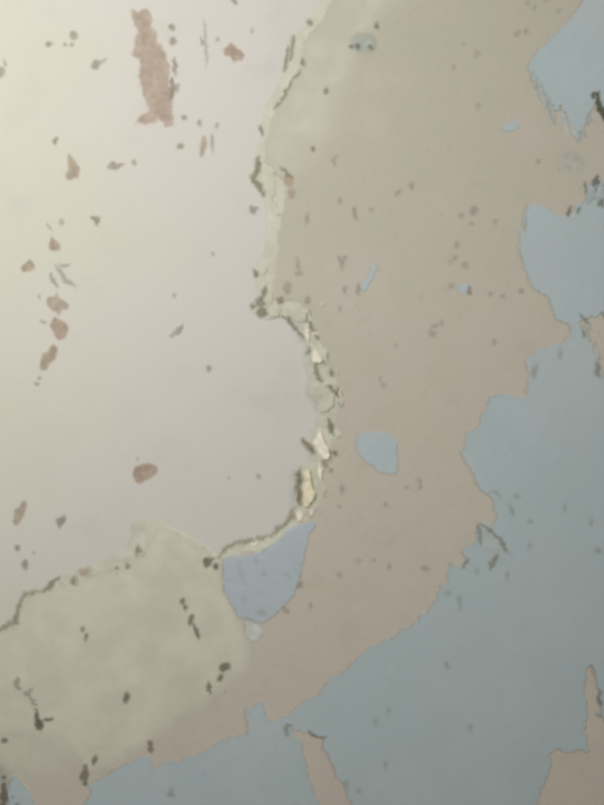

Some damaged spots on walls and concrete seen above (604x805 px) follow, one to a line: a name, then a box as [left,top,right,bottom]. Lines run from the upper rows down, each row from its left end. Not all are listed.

flaking render [0,0,321,628]
peeling [121,0,604,771]
spalling [0,776,21,805]
spalling [14,677,53,730]
peeling [21,765,118,805]
peeling [291,729,352,805]
peeling [536,665,604,805]